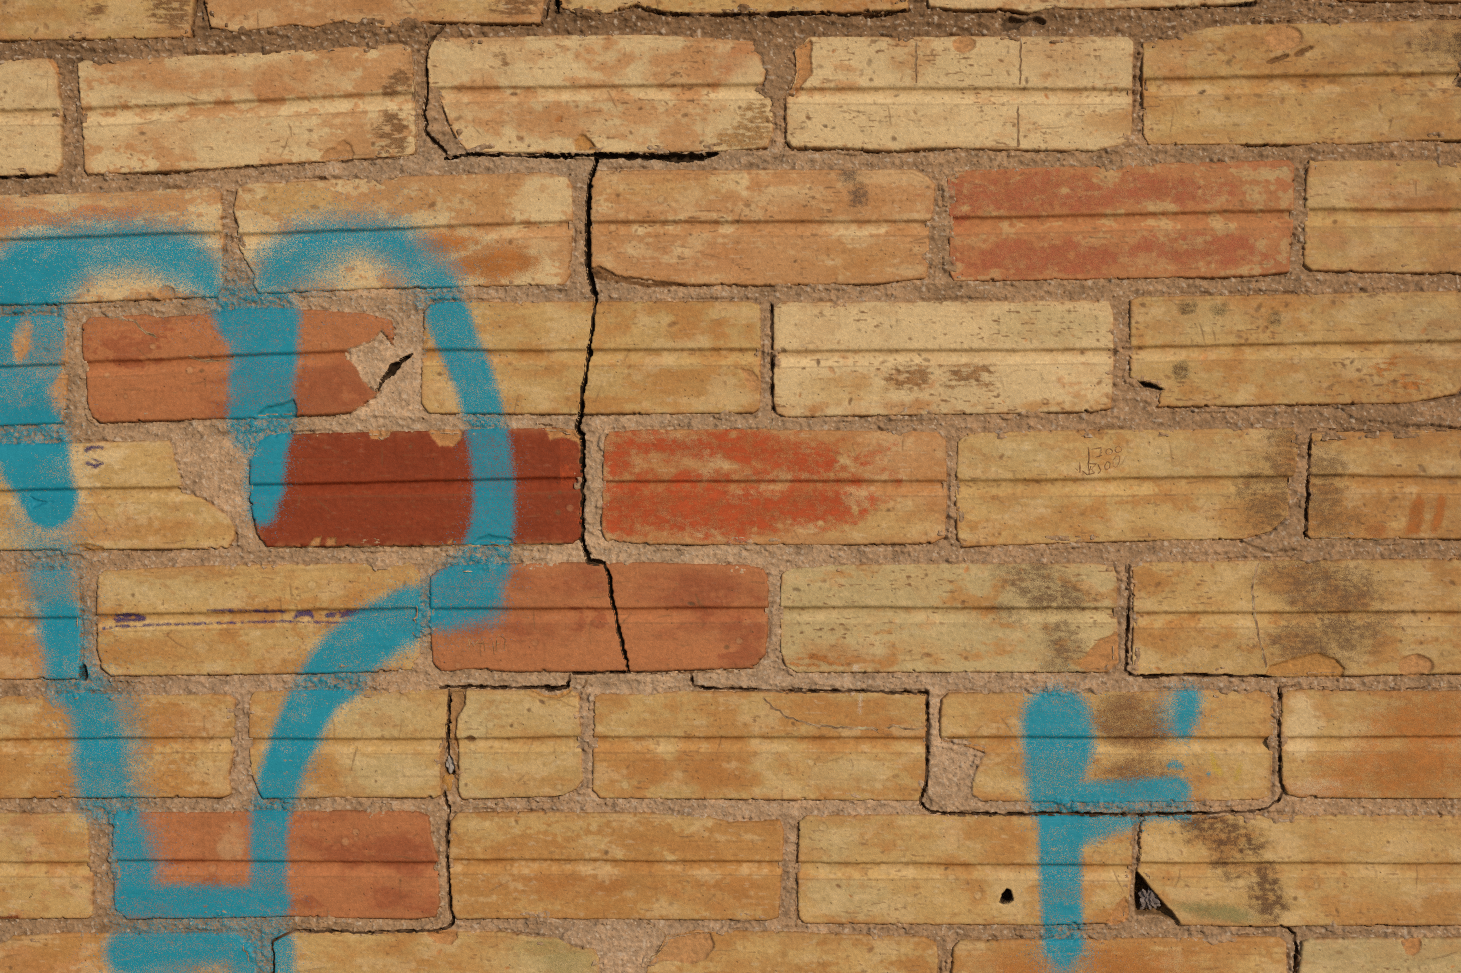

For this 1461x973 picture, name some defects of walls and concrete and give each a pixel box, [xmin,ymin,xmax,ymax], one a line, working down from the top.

crack [541,0,918,83]
crack [0,172,56,180]
crack [87,21,1362,866]
crack [1304,427,1461,541]
crack [1374,683,1461,691]
crack [793,820,801,927]
spalling [1105,869,1180,925]